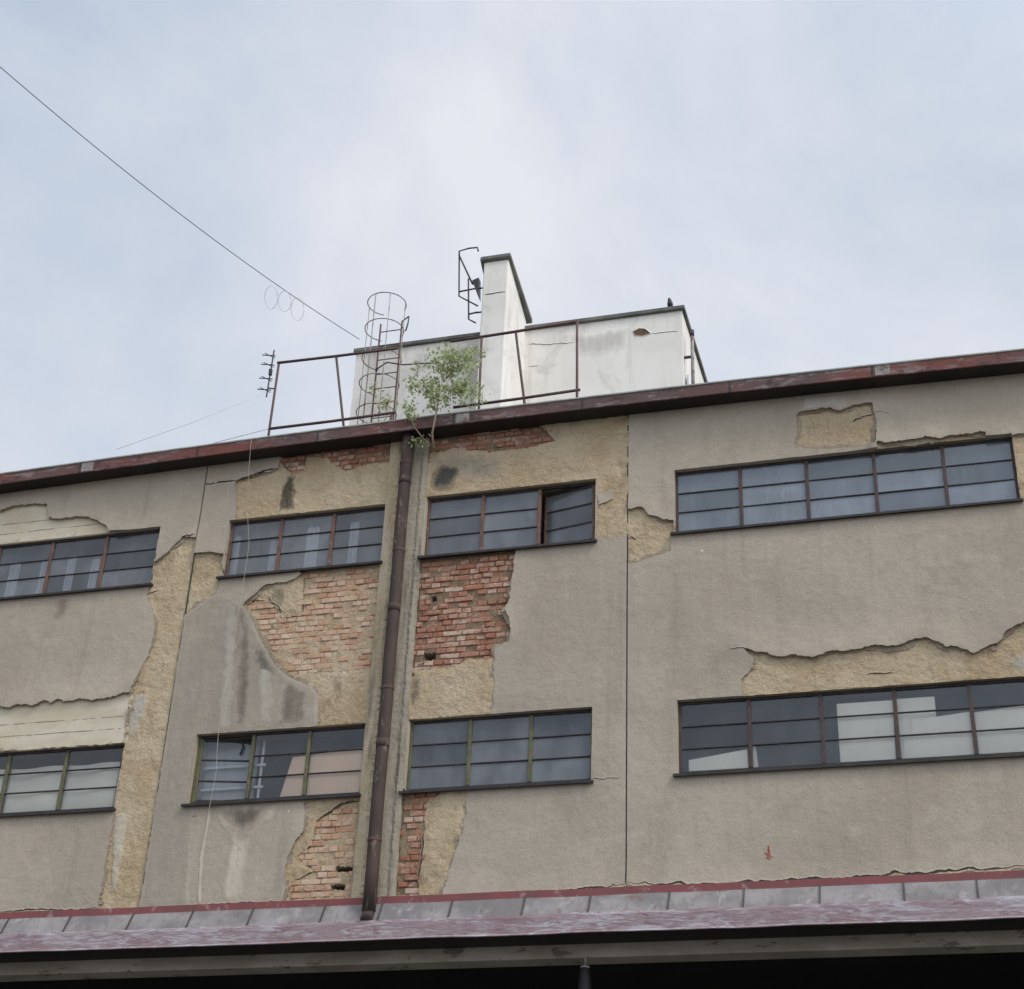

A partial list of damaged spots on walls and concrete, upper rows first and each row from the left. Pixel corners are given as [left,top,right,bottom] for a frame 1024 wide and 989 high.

spalling [797,402,872,416]
spalling [0,503,106,526]
flaking render [235,444,390,516]
damp [429,447,507,492]
flaking render [428,428,555,463]
flaking render [242,567,380,675]
flaking render [412,555,515,673]
spalling [741,622,1024,692]
damp [139,594,317,907]
flaking render [282,798,358,900]
flaking render [397,789,441,896]